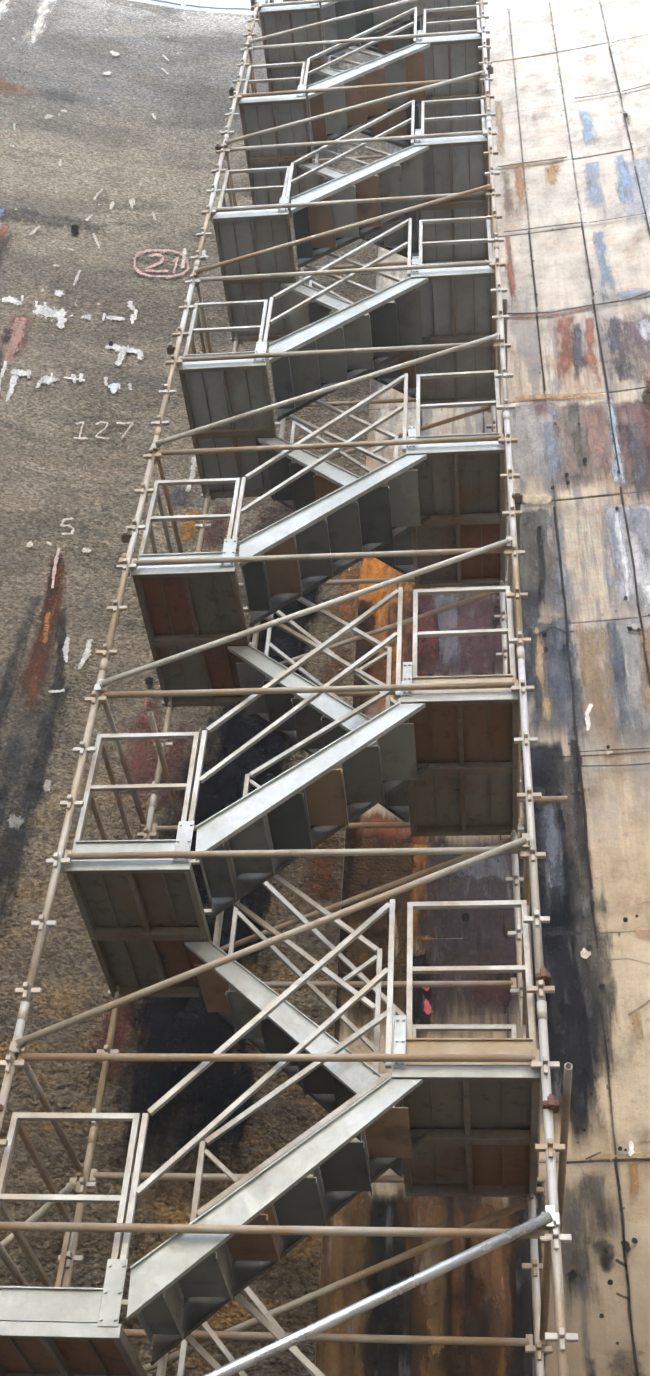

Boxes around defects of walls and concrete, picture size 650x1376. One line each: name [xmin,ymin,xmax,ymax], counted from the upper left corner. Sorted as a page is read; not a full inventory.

leakage [369,379,416,449]
corrosion [505,237,515,294]
corrosion [513,306,650,489]
leakage [602,314,650,377]
corrosion [22,548,64,695]
leakage [0,598,93,919]
leakage [353,401,650,1134]
leakage [334,817,359,1041]